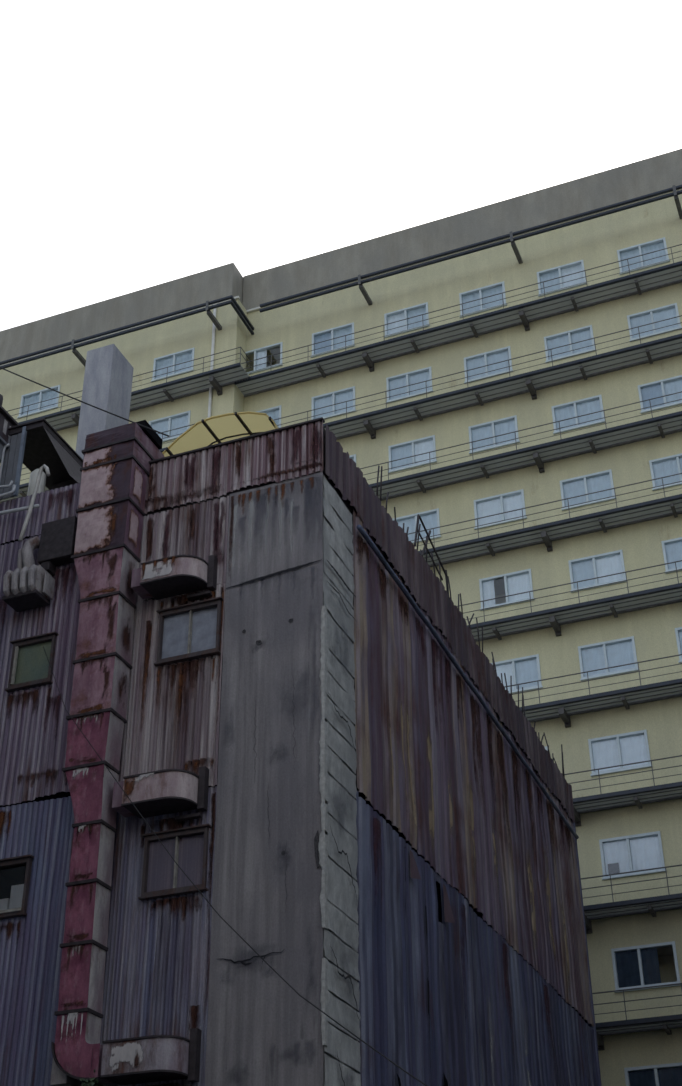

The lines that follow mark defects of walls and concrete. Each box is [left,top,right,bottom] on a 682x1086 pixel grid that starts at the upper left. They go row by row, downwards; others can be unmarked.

peeling [74,447,117,554]
peeling [128,466,143,548]
rust [53,426,322,727]
spalling [314,605,328,929]
rust [0,810,11,838]
crack [221,952,281,966]
spalling [320,958,328,1046]
peeling [109,1042,143,1072]